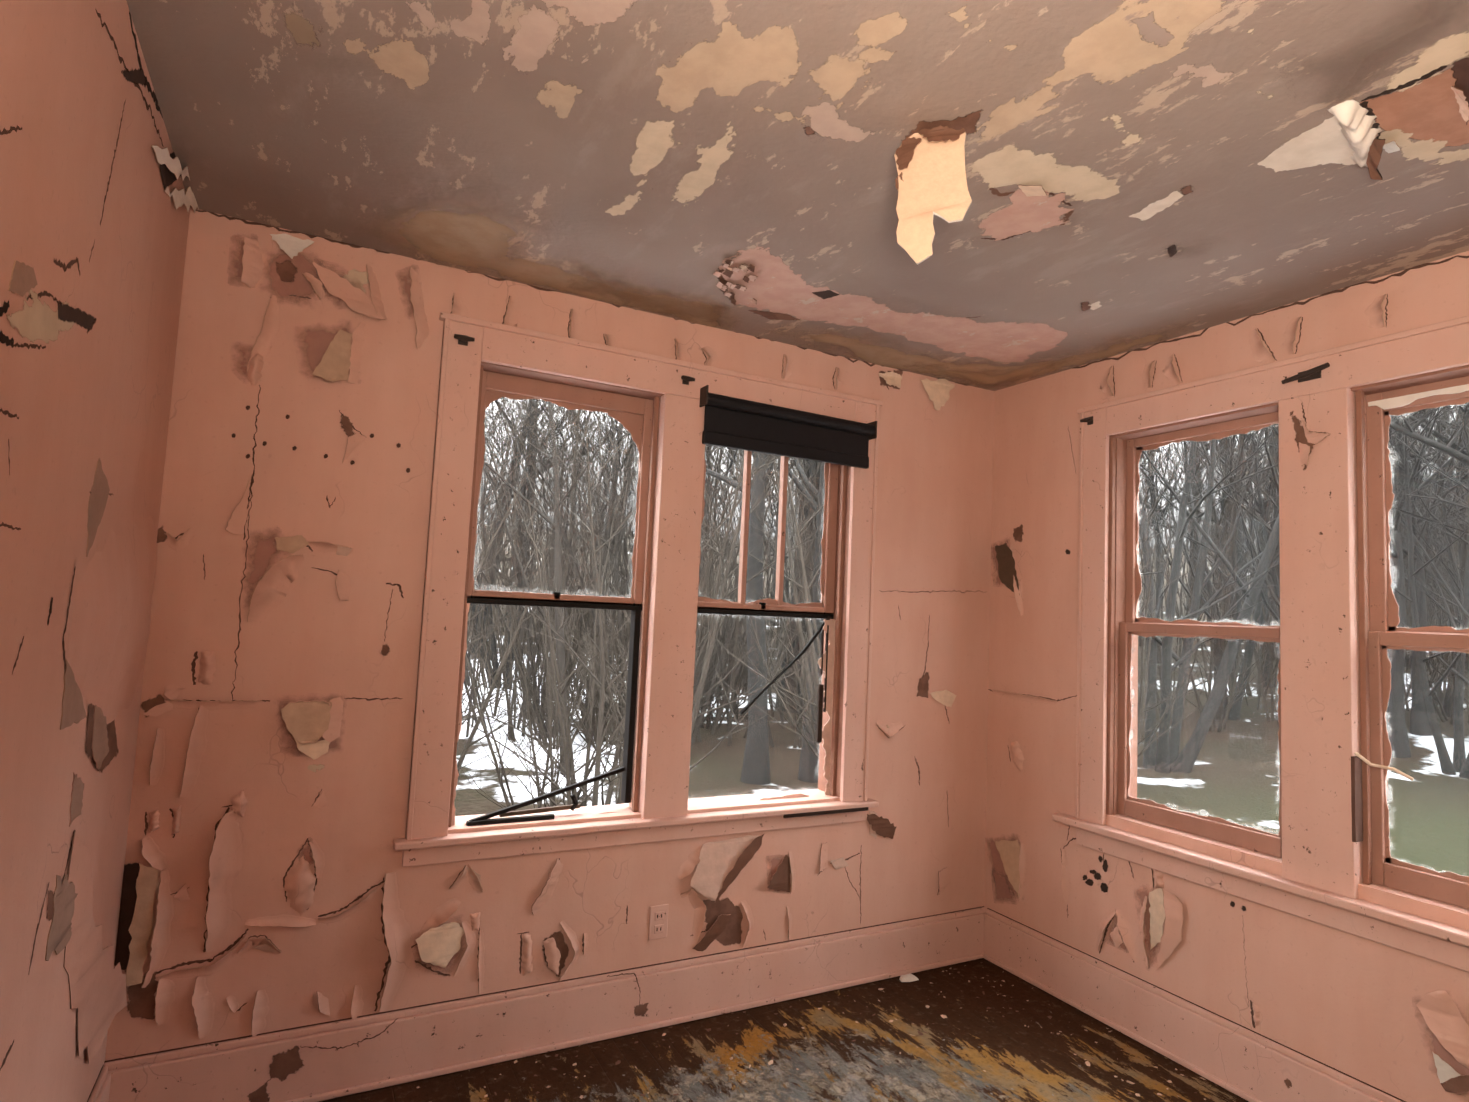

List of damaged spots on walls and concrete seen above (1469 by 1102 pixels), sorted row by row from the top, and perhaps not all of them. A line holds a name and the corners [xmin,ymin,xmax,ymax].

peeling [1386,31,1469,125]
crack [0,125,22,135]
peeling [894,0,1233,265]
peeling [1257,100,1469,180]
peeling [0,260,96,350]
damp [402,211,717,326]
peeling [713,246,1068,364]
crack [0,408,19,475]
crack [0,522,21,530]
peeling [992,524,1024,615]
peeling [28,772,215,1063]
peeling [677,833,796,951]